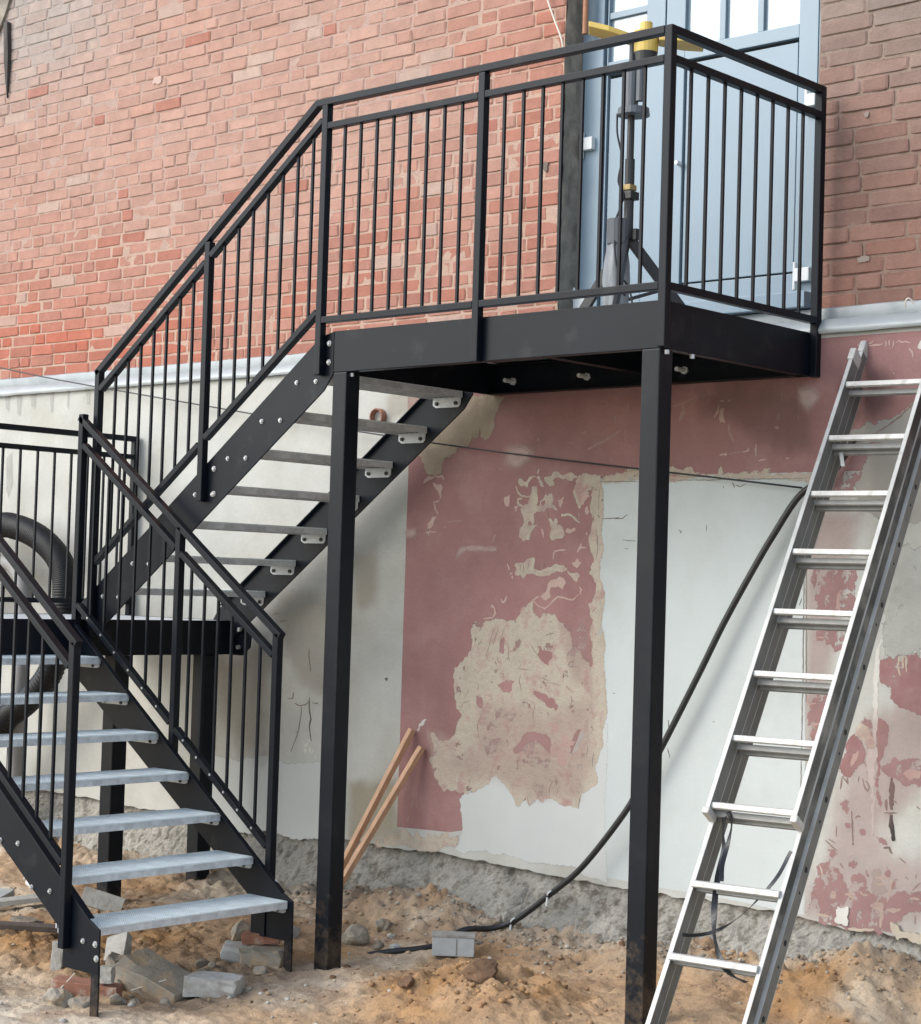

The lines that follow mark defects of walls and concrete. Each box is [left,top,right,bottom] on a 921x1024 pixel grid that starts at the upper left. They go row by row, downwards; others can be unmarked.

peeling [419,395,505,535]
peeling [669,466,811,483]
peeling [417,467,639,809]
spalling [890,922,921,944]